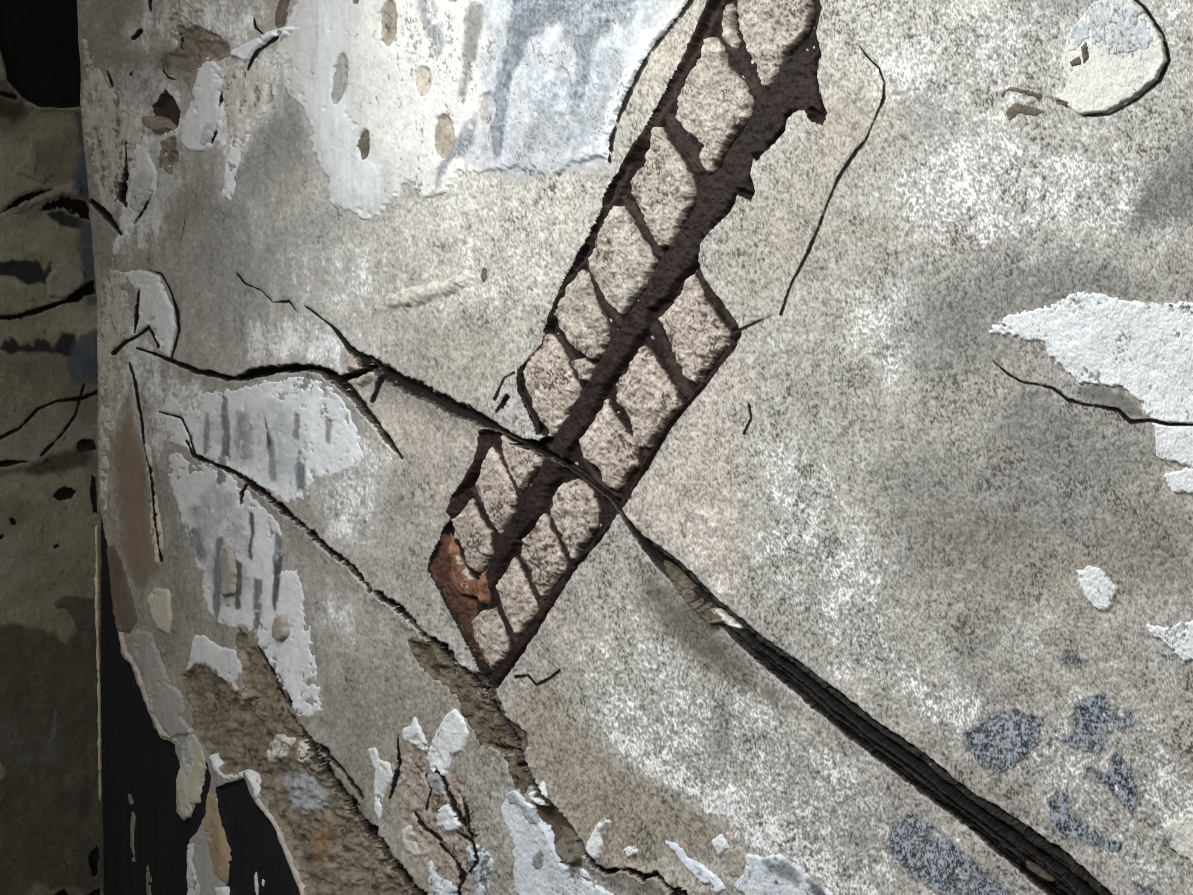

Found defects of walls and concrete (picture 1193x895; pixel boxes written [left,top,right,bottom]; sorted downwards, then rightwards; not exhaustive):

damp [422,0,441,54]
damp [438,0,669,177]
peeling [1001,0,1167,121]
crack [738,45,885,331]
crack [0,280,96,321]
crack [0,383,98,467]
spalling [0,0,833,895]
peeling [989,291,1193,494]
crack [992,360,1193,426]
crack [111,270,624,809]
corrosion [430,533,491,660]
crack [582,850,688,895]